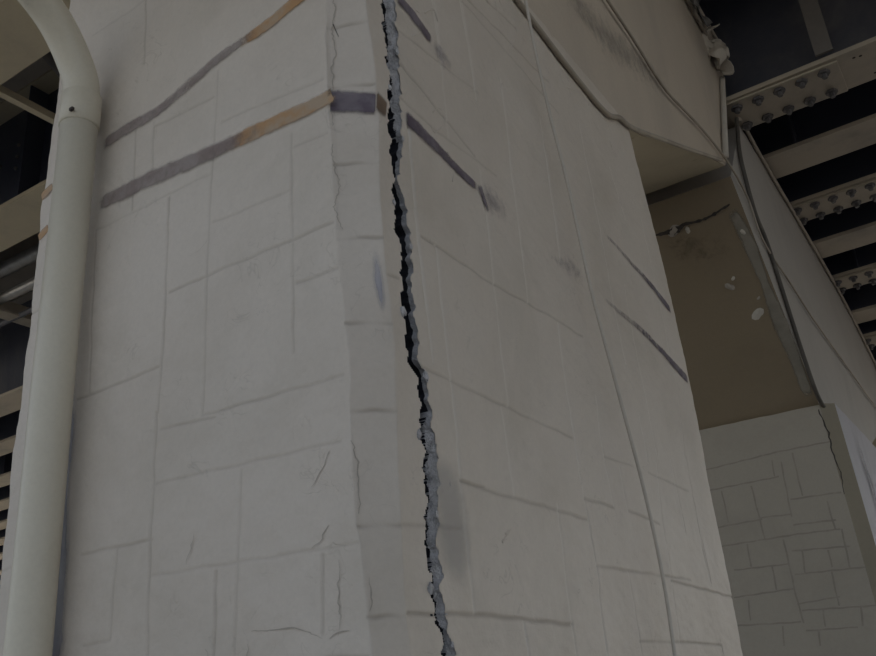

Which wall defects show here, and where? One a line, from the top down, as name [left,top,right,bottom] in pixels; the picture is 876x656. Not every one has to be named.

crack [331,0,343,229]
crack [380,0,457,656]
crack [656,204,730,236]